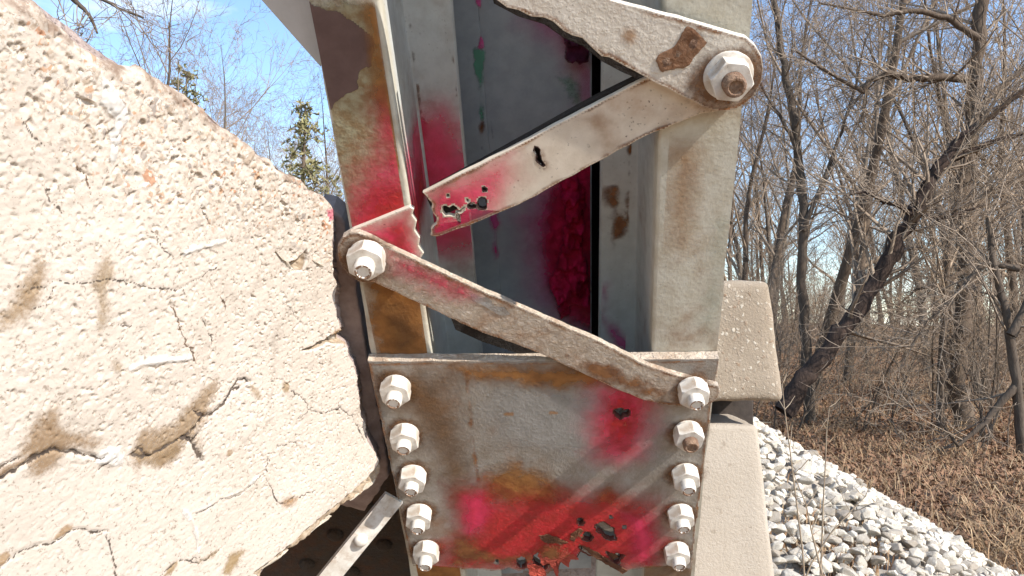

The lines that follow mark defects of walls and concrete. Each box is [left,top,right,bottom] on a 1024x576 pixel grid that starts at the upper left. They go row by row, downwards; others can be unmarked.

corrosion [364,4,400,170]
corrosion [654,14,764,110]
corrosion [604,186,629,239]
crack [17,267,226,362]
corrosion [402,255,511,306]
crack [0,446,108,479]
damp [0,384,216,476]
crack [131,378,248,461]
crack [200,441,314,512]
crack [285,382,361,433]
corrosion [460,341,718,405]
crack [7,527,117,576]